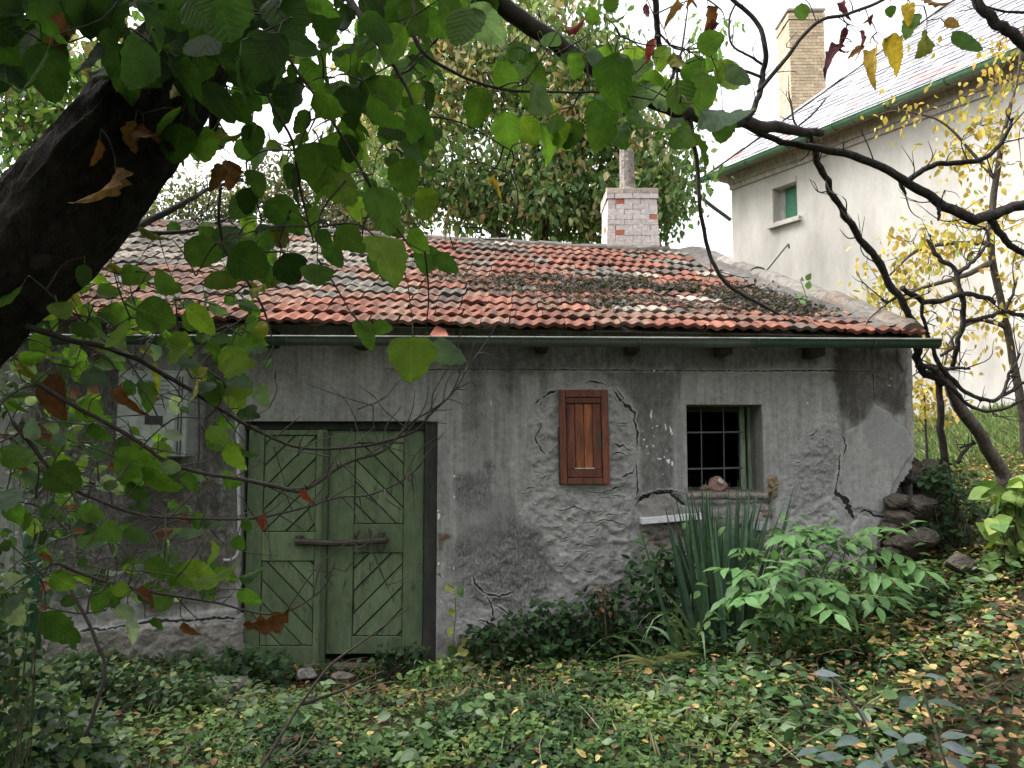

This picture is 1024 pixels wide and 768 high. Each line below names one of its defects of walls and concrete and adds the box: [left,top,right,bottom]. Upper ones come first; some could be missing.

damp [834,348,903,421]
crack [427,367,885,576]
crack [78,614,240,635]
crack [470,574,517,632]